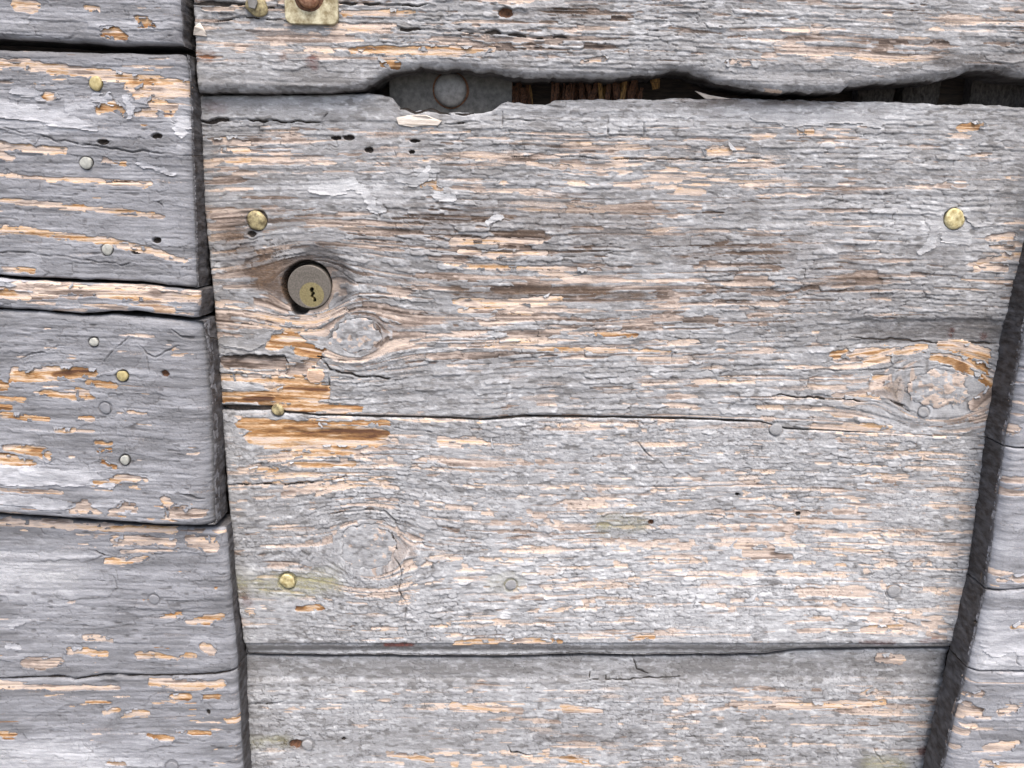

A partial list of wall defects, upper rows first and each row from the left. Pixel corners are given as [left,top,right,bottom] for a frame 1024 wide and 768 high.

peeling [0,58,192,138]
peeling [0,141,176,188]
peeling [0,198,165,219]
peeling [0,224,188,263]
peeling [0,366,118,433]
peeling [220,373,391,473]
crack [223,355,863,432]
peeling [829,339,993,423]
peeling [0,440,220,565]
peeling [160,609,255,625]
peeling [5,634,113,670]
crack [589,659,679,680]